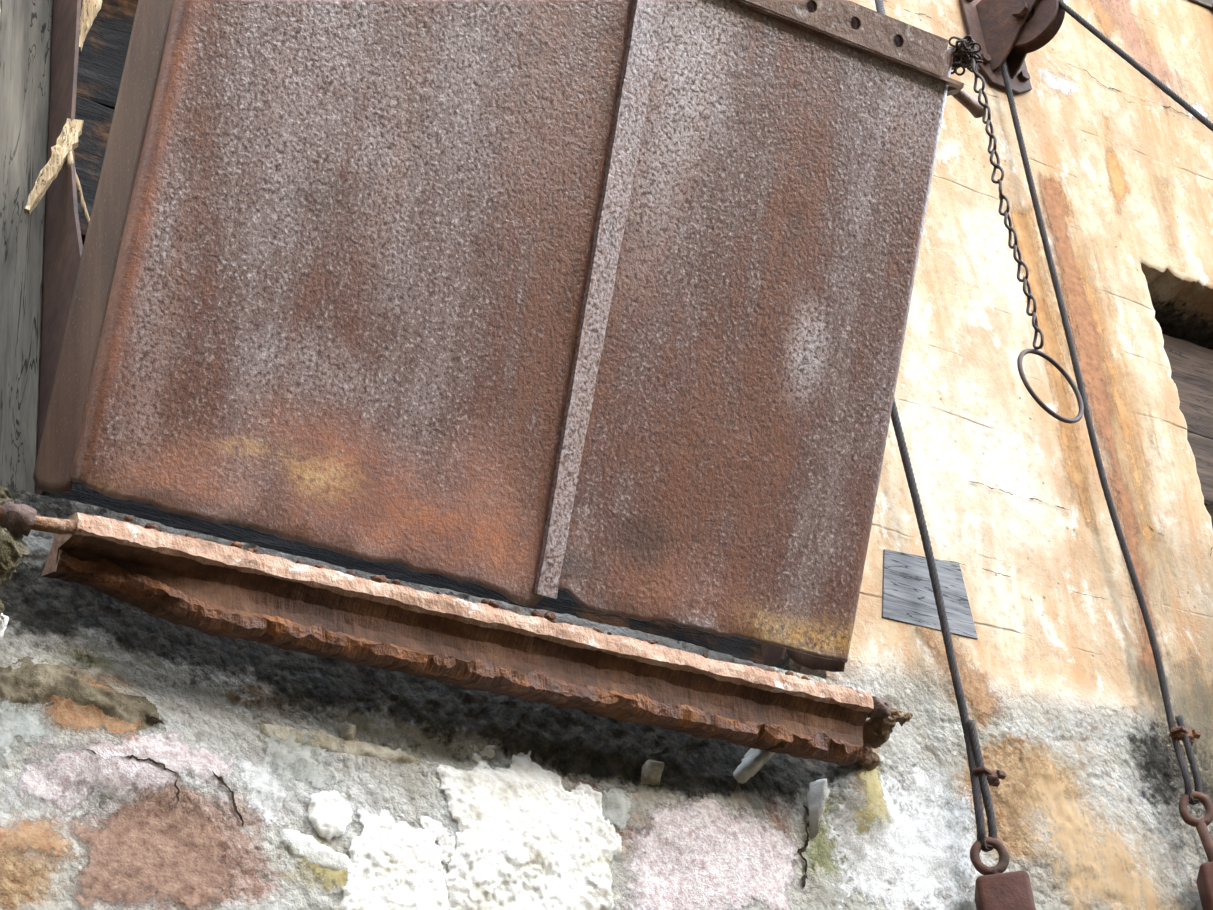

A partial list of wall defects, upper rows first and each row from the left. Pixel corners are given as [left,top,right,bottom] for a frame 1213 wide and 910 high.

rust [1011,174,1166,682]
peeling [256,722,422,763]
peeling [641,759,664,785]
peeling [733,748,775,784]
peeling [279,829,391,871]